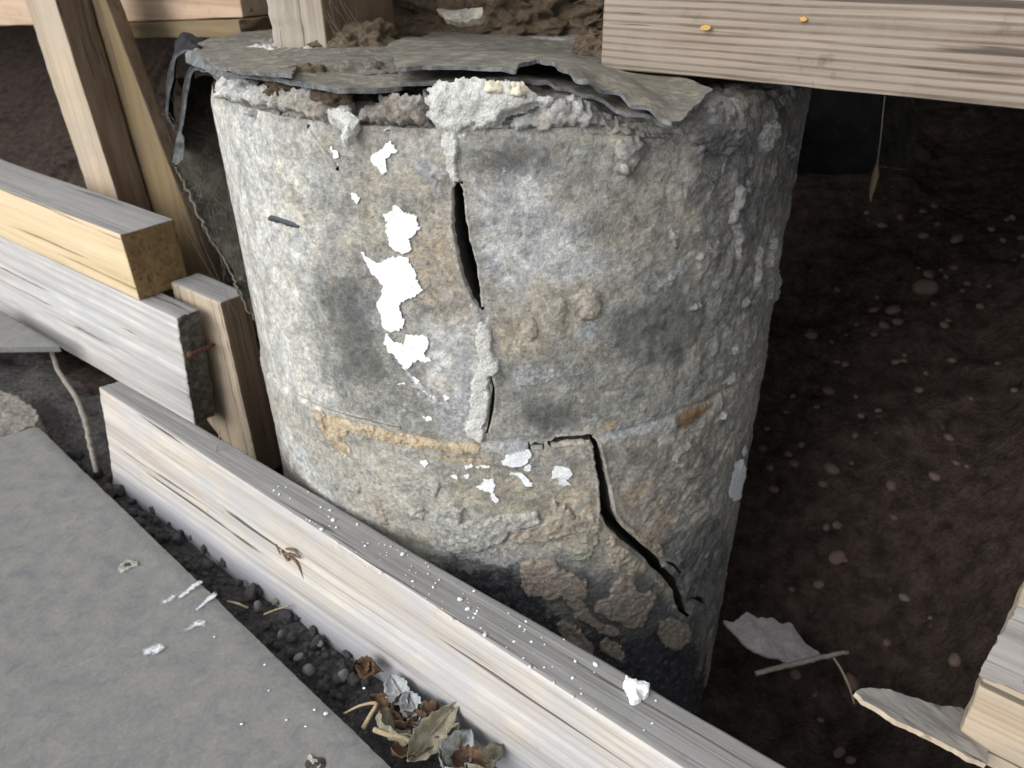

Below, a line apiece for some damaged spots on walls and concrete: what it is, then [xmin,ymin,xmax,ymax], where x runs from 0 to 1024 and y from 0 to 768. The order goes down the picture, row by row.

peeling [370,141,398,175]
spalling [211,77,672,159]
peeling [361,205,450,401]
crack [448,182,485,309]
corrosion [311,410,486,465]
crack [484,376,498,433]
damp [428,538,562,637]
peeling [408,448,692,663]
crack [529,431,709,676]
damp [576,573,707,715]